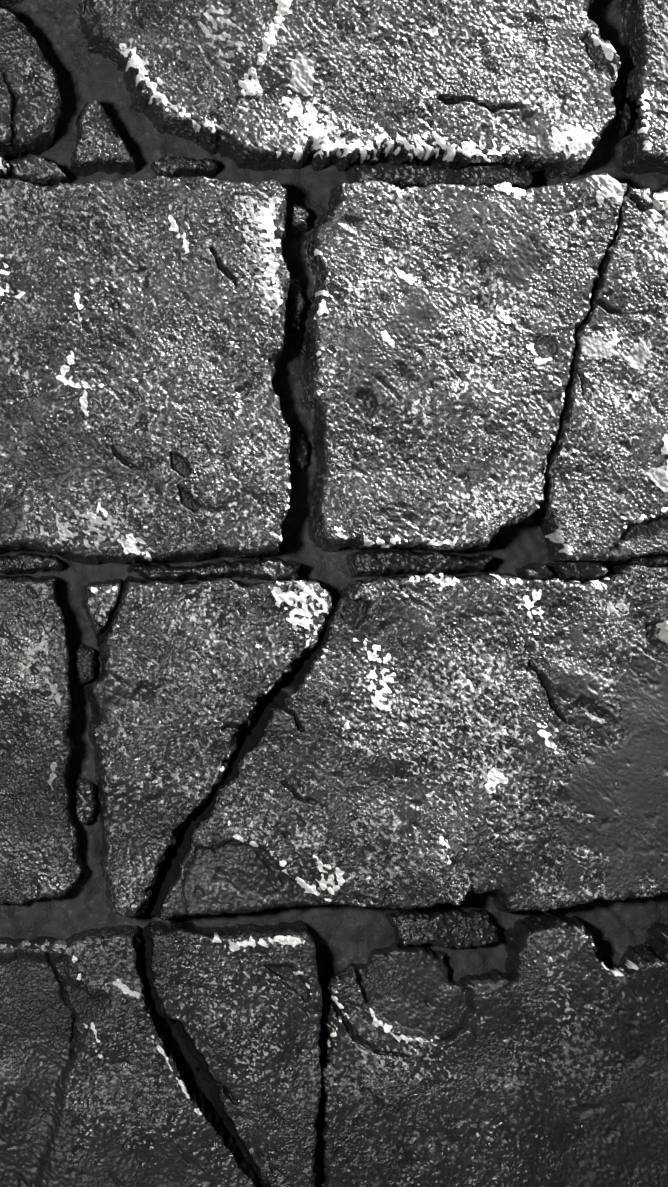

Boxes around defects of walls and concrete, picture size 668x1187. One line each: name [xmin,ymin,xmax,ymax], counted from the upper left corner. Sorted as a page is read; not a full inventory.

crack [538,190,665,510]
crack [133,599,337,1187]